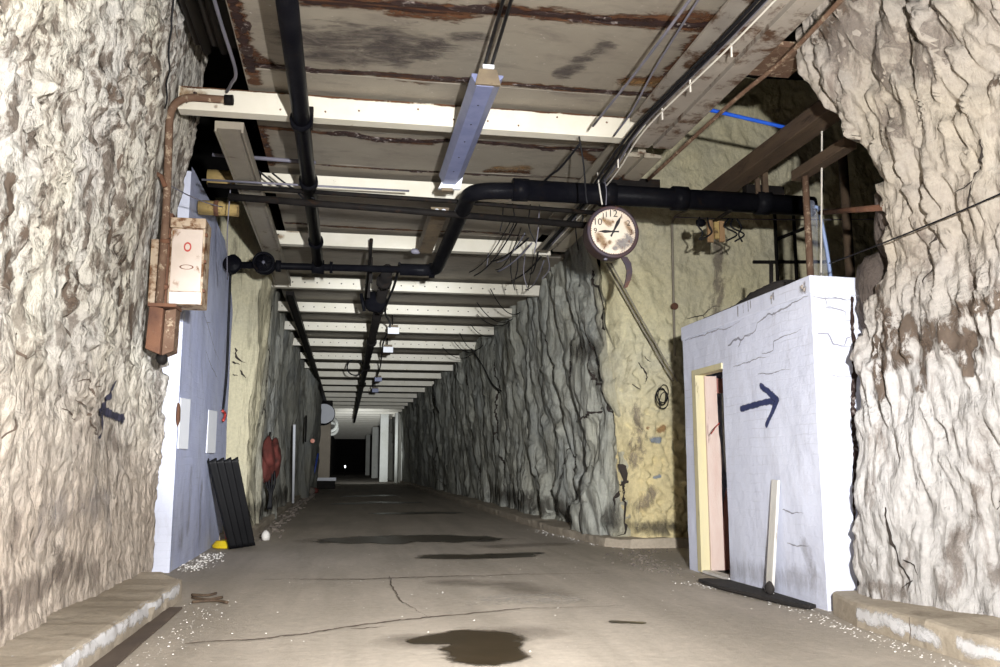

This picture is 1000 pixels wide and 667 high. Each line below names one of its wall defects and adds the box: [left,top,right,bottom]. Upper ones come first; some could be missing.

rust [299,0,715,98]
crack [685,296,859,537]
crack [185,576,533,644]